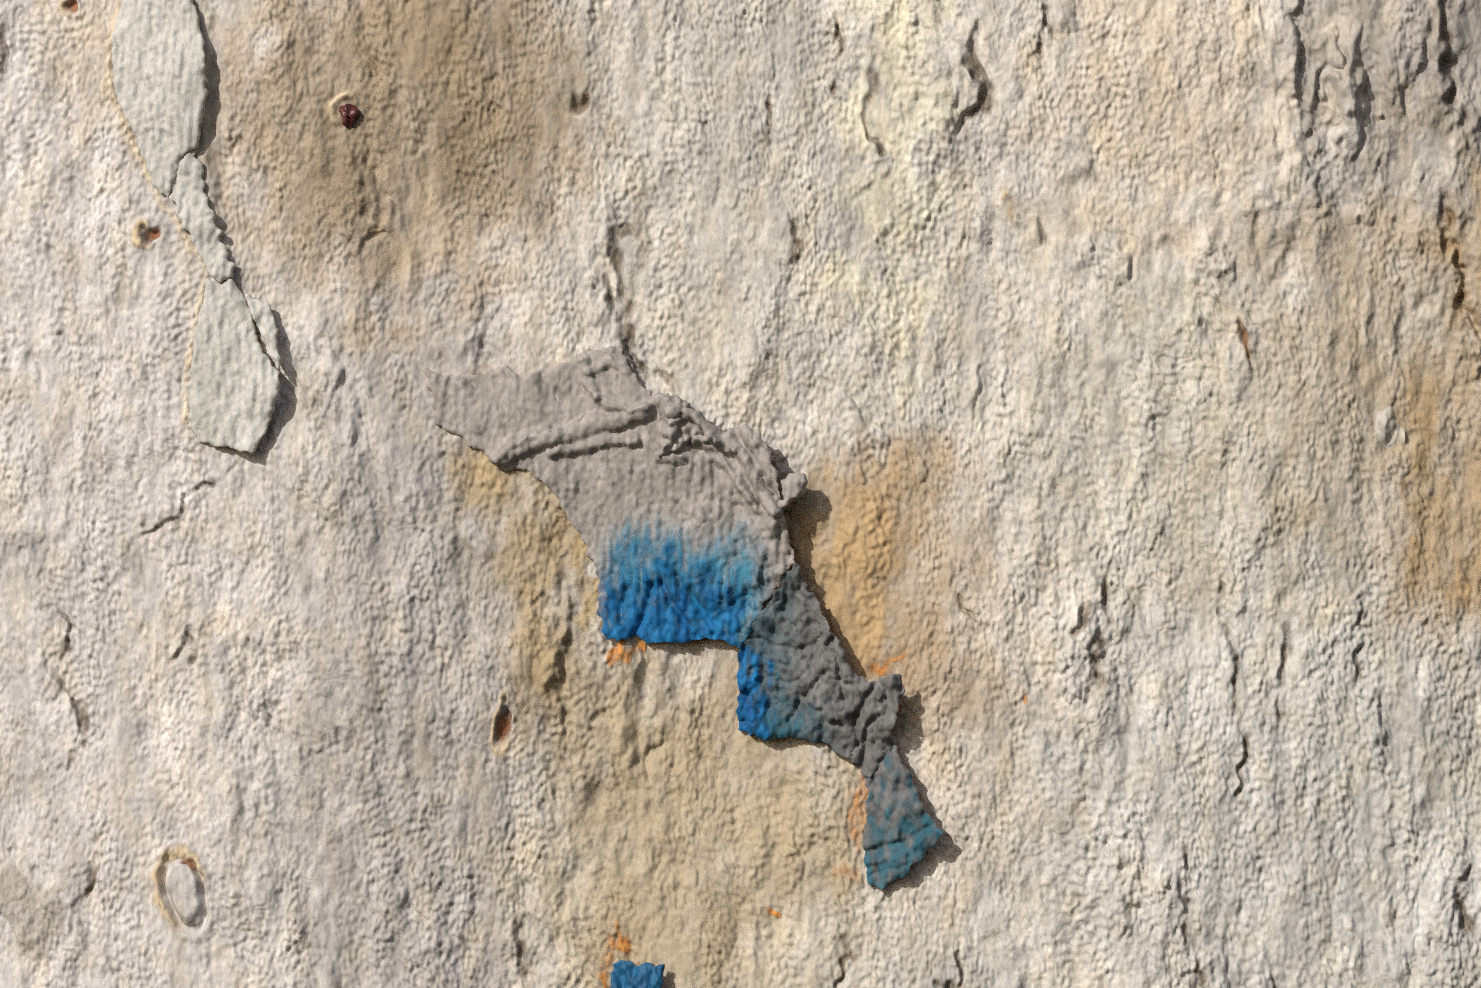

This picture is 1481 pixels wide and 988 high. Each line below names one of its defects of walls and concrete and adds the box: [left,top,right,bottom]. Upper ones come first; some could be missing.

peeling [610,960,665,988]